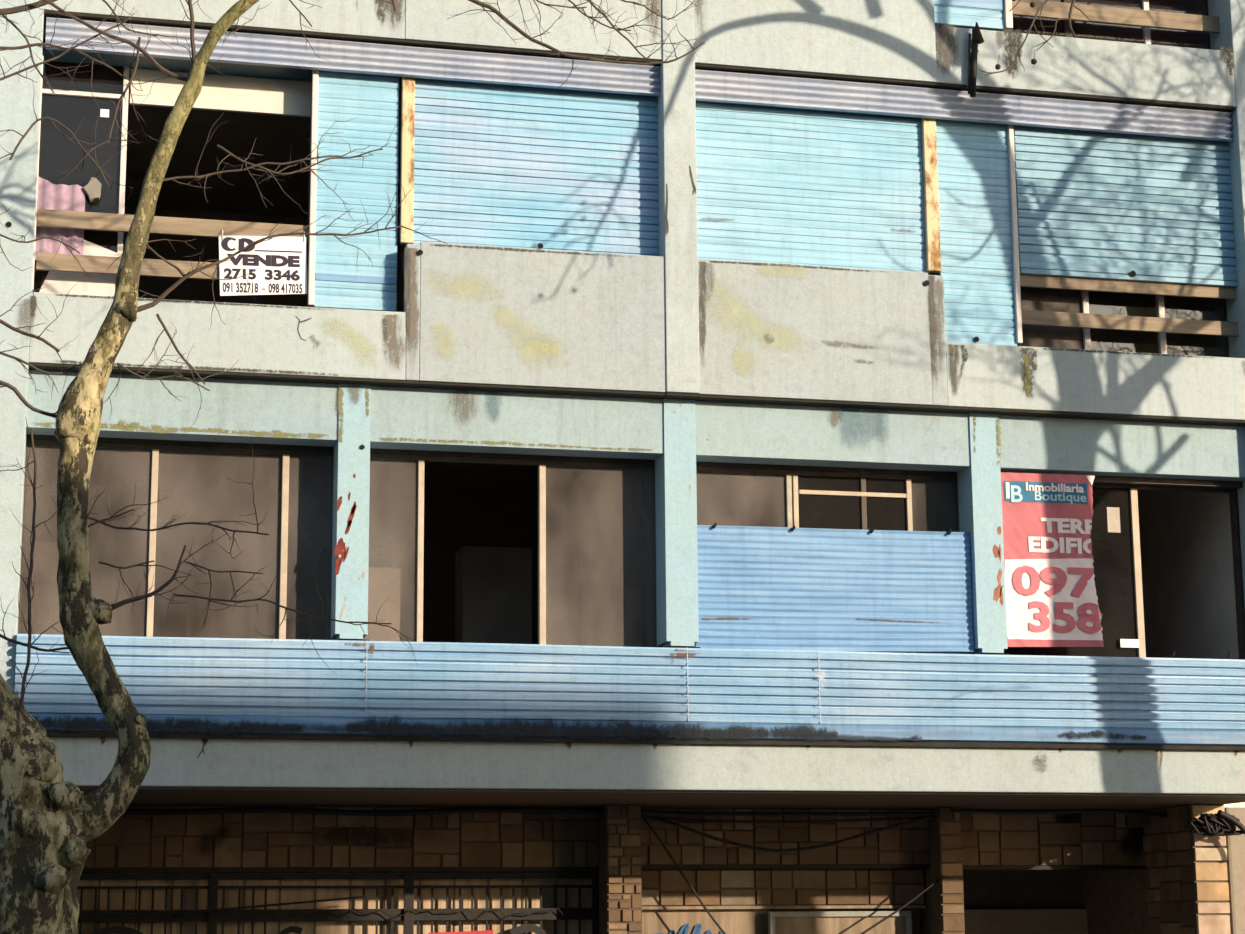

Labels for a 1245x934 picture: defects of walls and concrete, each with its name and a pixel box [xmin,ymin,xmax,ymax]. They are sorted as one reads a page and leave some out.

water stain [936,23,957,71]
water stain [997,29,1023,75]
water stain [699,262,713,351]
water stain [928,275,968,392]
water stain [1020,348,1037,397]